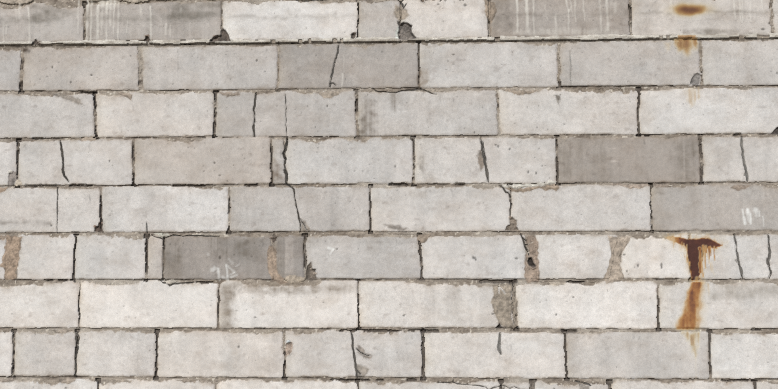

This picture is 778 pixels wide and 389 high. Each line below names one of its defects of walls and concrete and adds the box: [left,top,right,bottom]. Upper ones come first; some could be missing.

spalling [394,21,418,43]
rust [661,34,702,61]
rust [655,0,728,22]
crack [57,141,68,214]
crack [283,124,307,232]
crack [480,141,510,196]
crack [734,235,743,278]
crack [765,235,773,278]
rust [656,233,733,379]
crack [438,381,519,389]